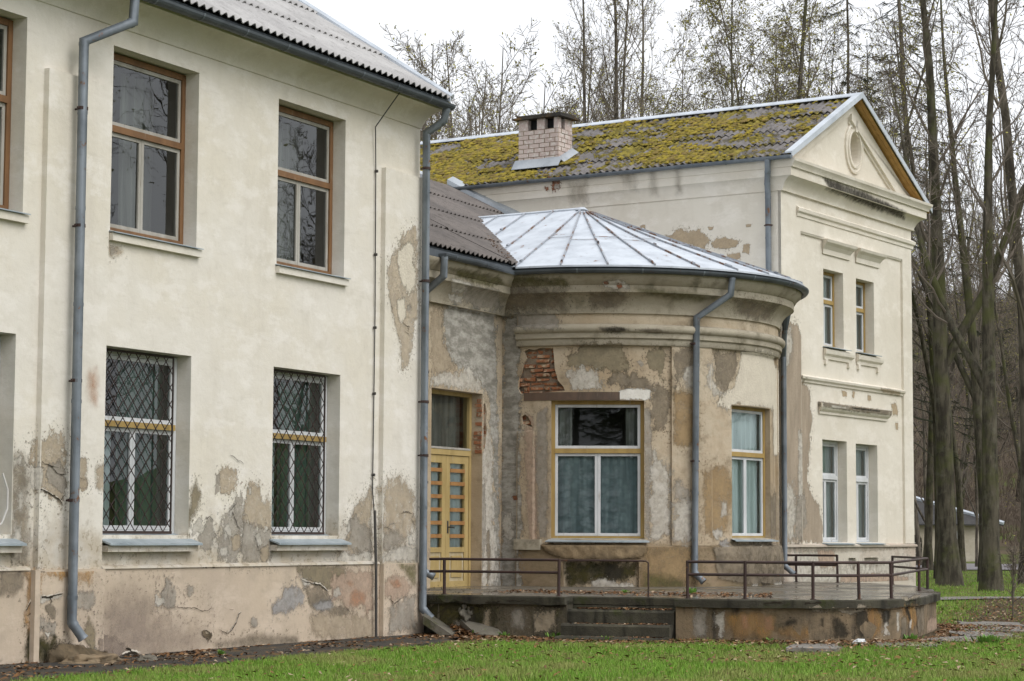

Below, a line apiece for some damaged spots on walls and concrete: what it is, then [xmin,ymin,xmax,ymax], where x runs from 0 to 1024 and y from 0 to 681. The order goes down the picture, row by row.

flaking render [387,222,421,374]
flaking render [666,226,750,260]
flaking render [25,425,89,509]
flaking render [155,574,194,609]
flaking render [190,466,271,569]
flaking render [298,472,419,640]
peeling [429,362,540,586]
flaking render [519,320,915,583]